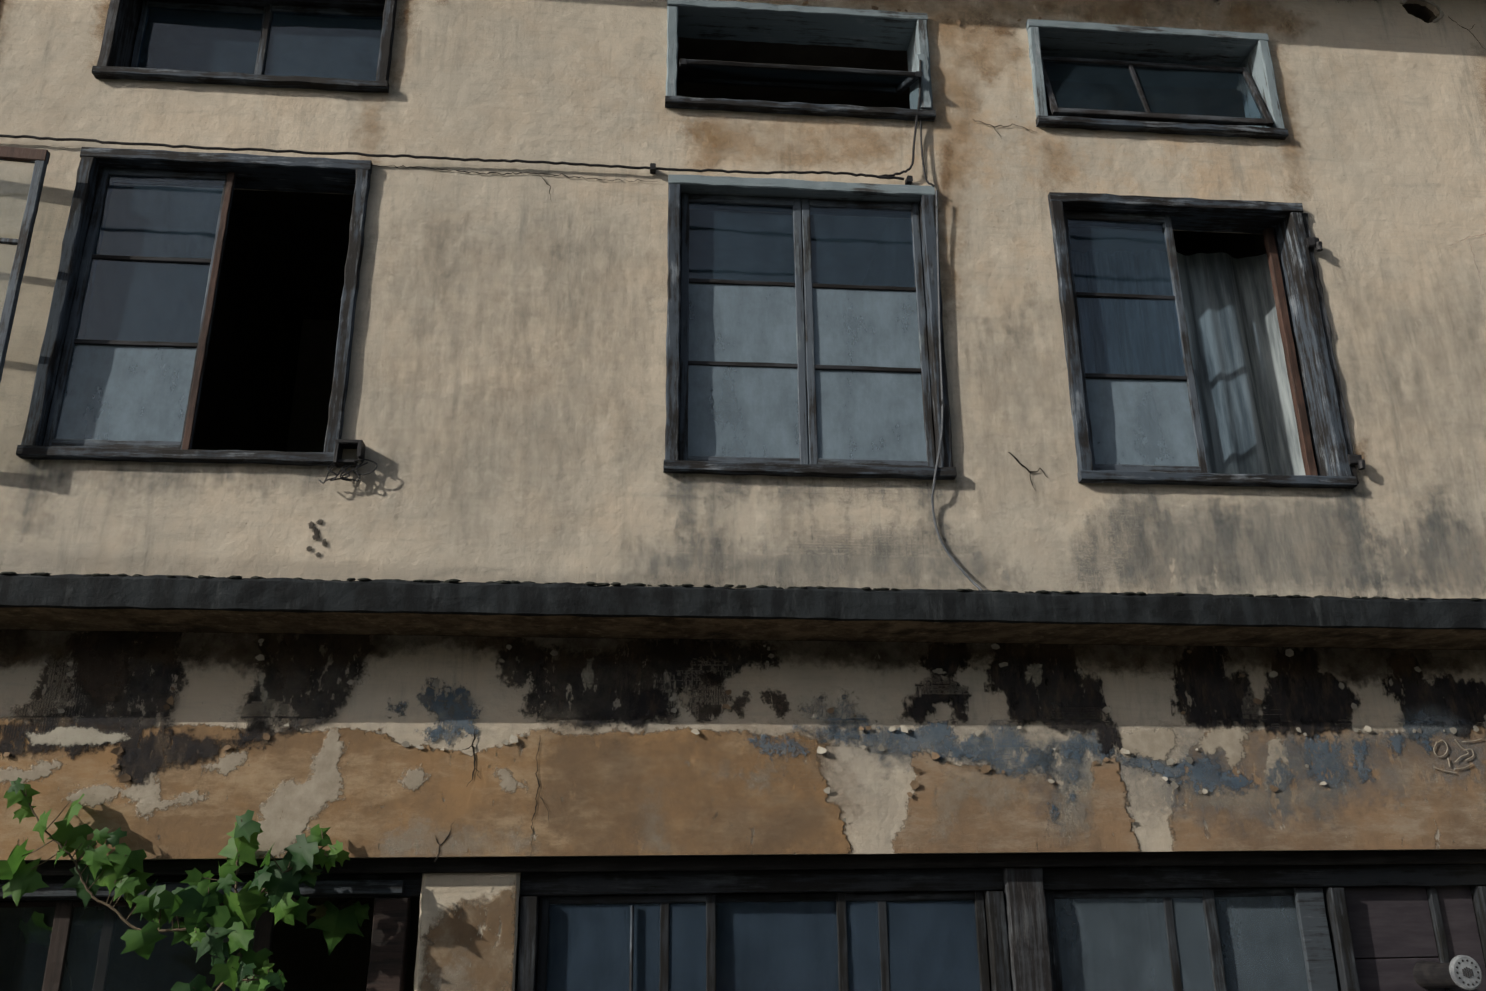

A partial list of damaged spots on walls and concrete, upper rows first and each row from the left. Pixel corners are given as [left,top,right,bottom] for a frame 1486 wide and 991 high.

crack [530,740,549,860]
flaking render [0,631,1486,860]
flaking render [420,883,517,991]